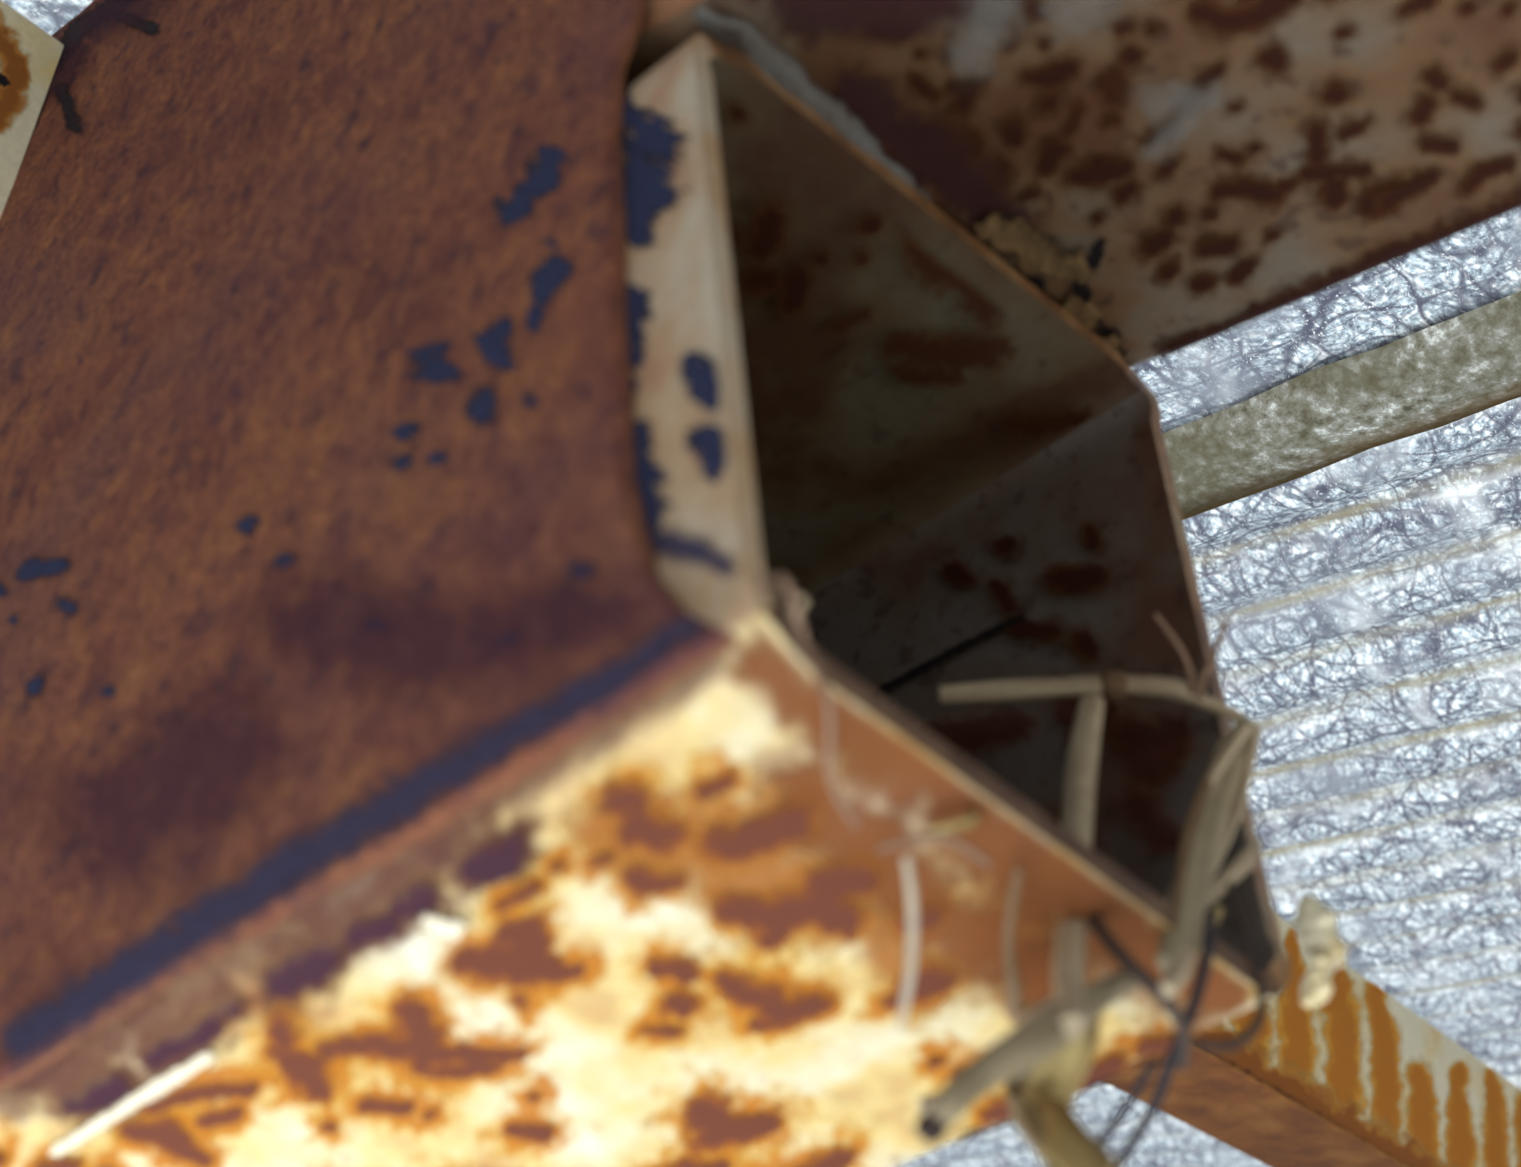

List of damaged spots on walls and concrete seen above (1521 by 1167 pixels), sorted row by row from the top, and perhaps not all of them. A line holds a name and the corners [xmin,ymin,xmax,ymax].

corrosion [0,10,31,133]
corrosion [48,0,159,135]
peeling [491,144,567,229]
peeling [621,79,691,249]
corrosion [750,0,1226,236]
corrosion [1187,0,1299,75]
corrosion [1139,50,1521,358]
peeling [472,238,575,372]
peeling [388,421,449,472]
peeling [406,341,497,427]
peeling [626,283,735,578]
corrosion [0,633,1521,1167]